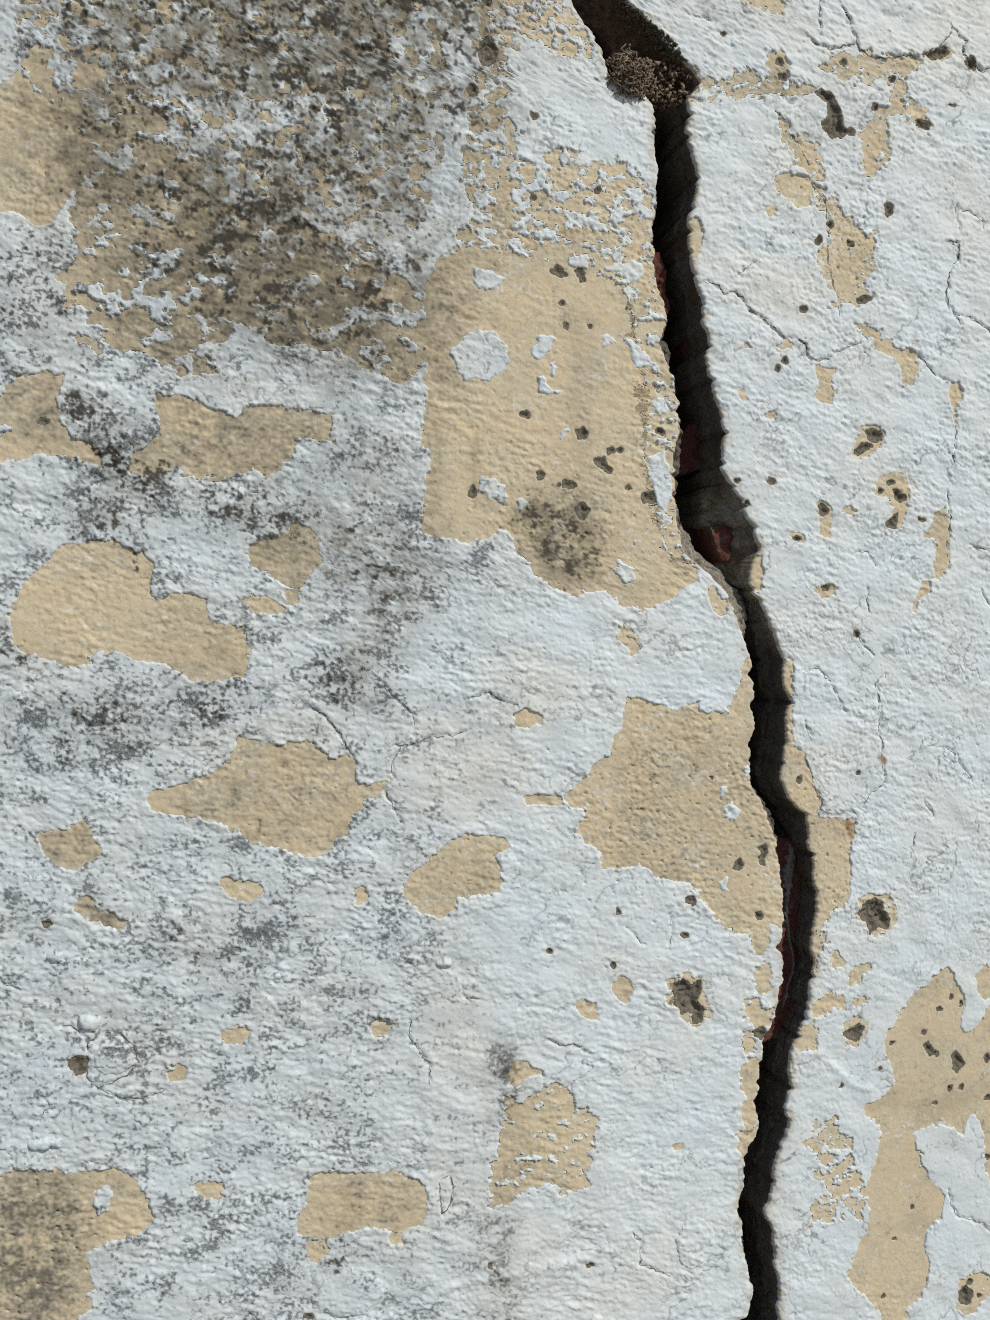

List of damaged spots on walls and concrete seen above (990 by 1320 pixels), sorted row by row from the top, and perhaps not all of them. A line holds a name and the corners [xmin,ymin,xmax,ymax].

water stain [0,232,72,321]
water stain [50,0,487,375]
peeling [0,0,727,616]
peeling [688,45,976,309]
peeling [7,523,323,682]
water stain [338,514,416,616]
crack [571,0,861,1320]
peeling [147,736,388,857]
peeling [523,658,784,1162]
peeling [0,1168,155,1320]
peeling [487,1060,599,1208]
peeling [802,965,990,1320]